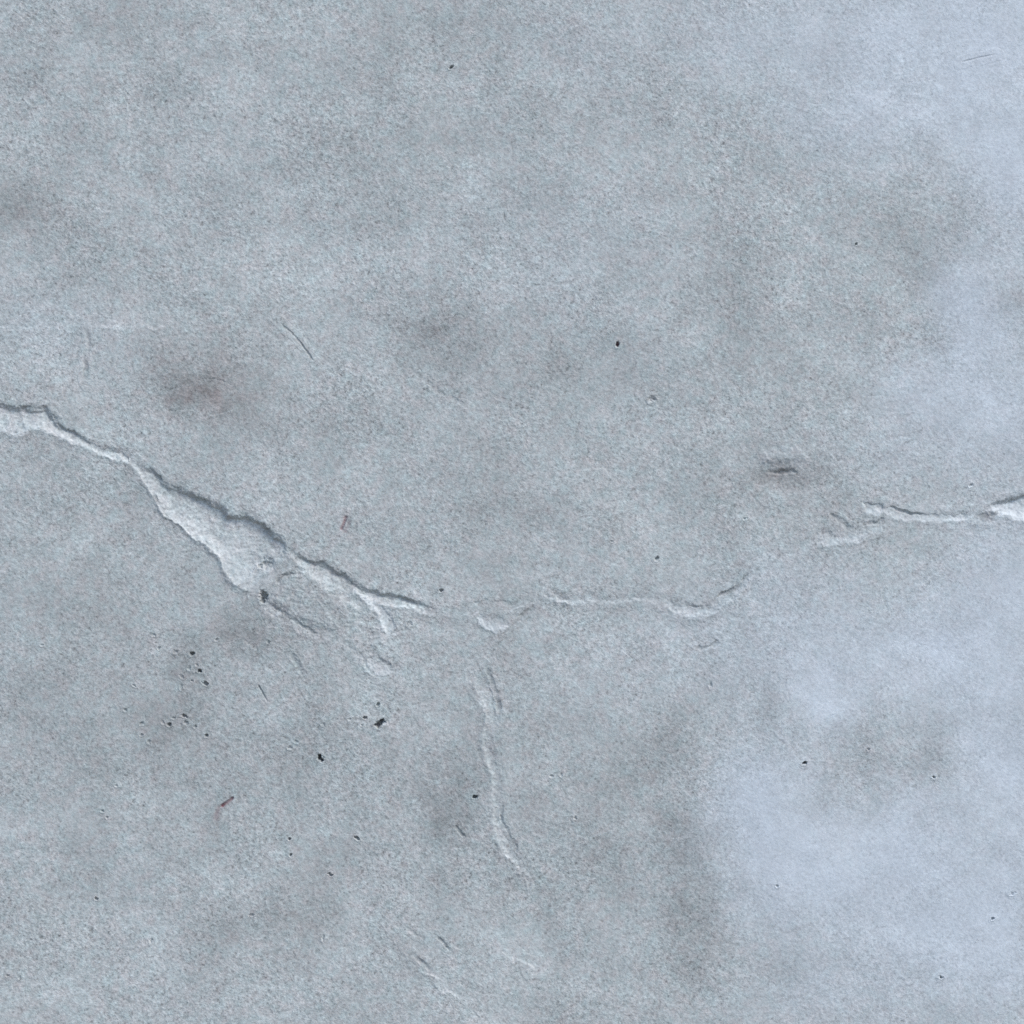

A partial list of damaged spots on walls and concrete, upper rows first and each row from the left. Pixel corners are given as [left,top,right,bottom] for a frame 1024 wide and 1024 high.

crack [0,394,129,473]
crack [293,488,1024,915]